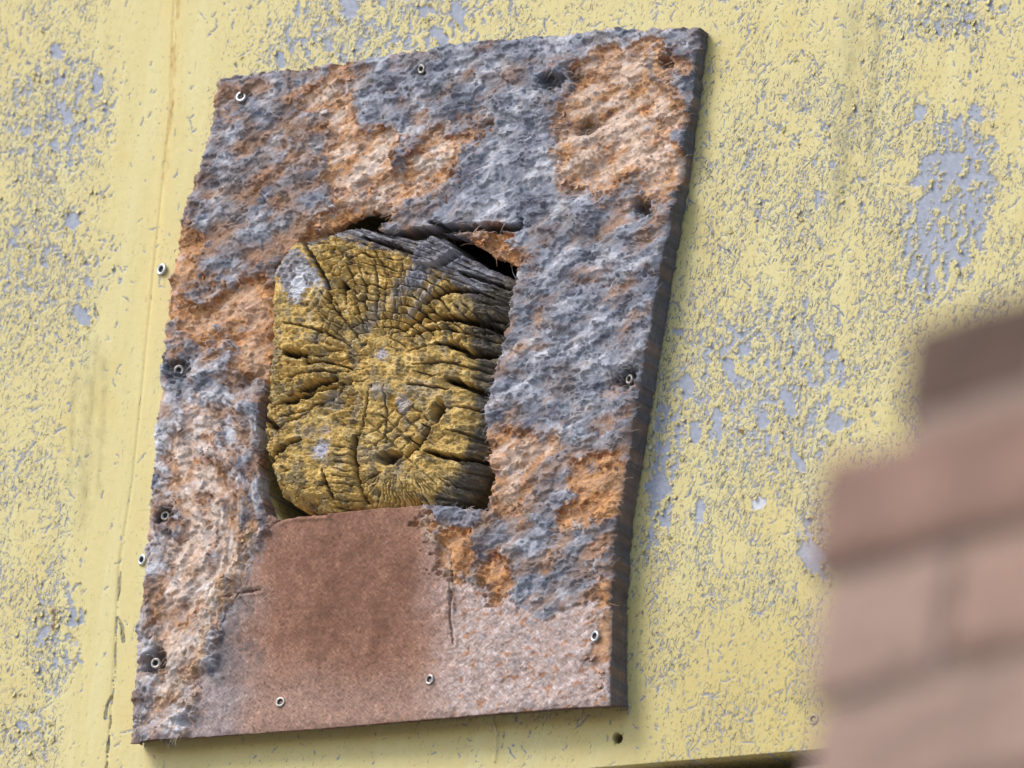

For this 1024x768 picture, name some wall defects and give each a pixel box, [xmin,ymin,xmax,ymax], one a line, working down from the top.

peeling [0,30,122,353]
crack [363,217,524,255]
crack [303,243,351,306]
crack [390,272,513,399]
peeling [641,50,1016,576]
crack [269,350,354,464]
crack [261,520,281,538]
crack [315,469,335,516]
crack [350,431,381,505]
crack [406,424,490,466]
peeling [0,552,86,761]